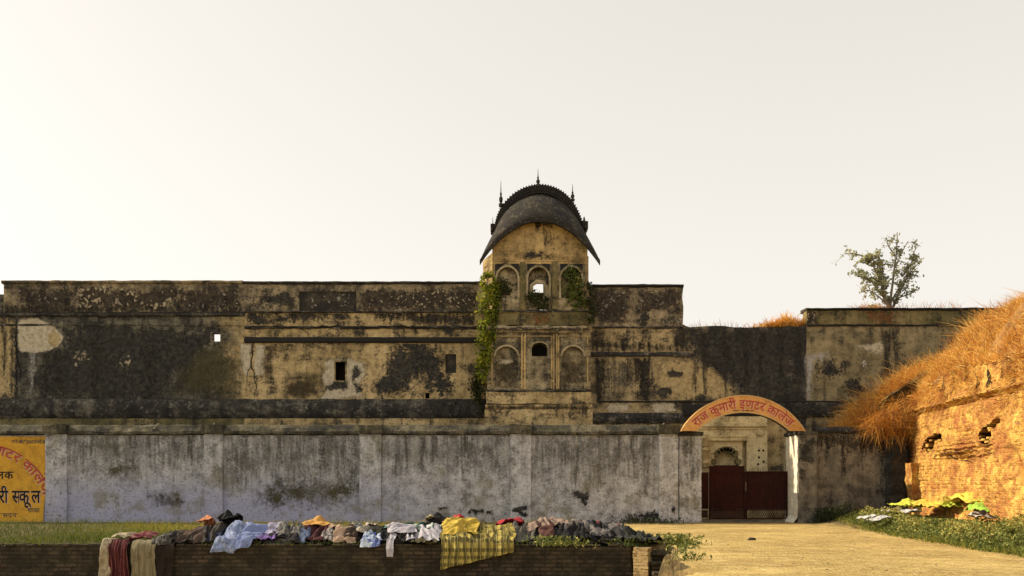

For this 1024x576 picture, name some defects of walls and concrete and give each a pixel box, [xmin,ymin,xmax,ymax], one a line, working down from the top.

leakage [1,290,588,417]
crack [240,324,463,395]
leakage [563,312,866,417]
leakage [869,327,900,382]
leakage [572,490,589,506]